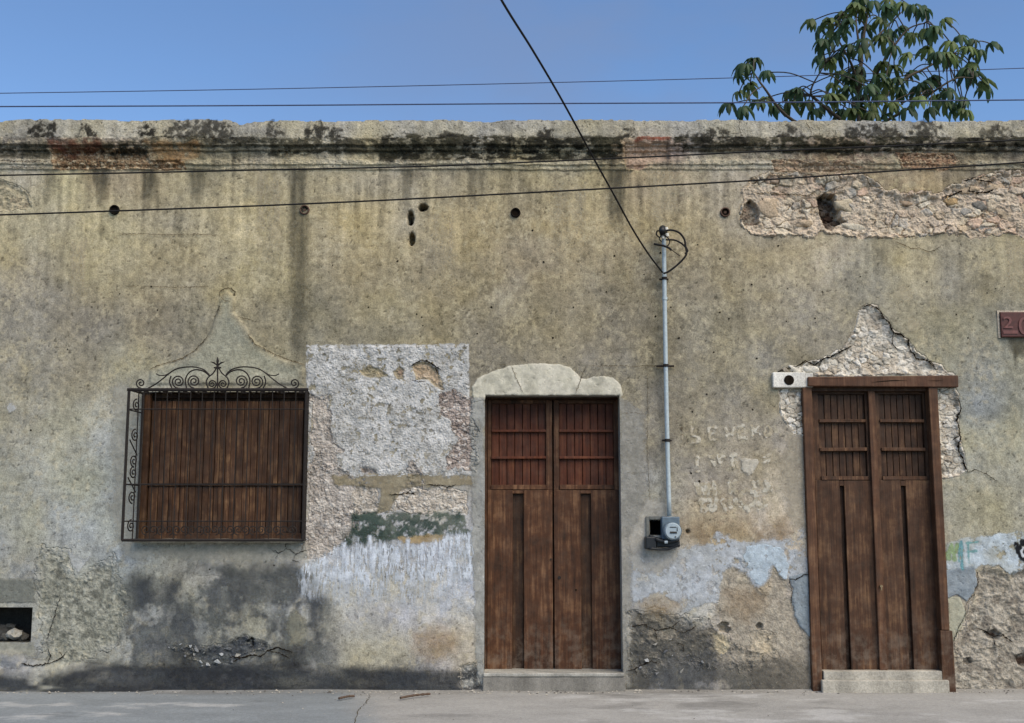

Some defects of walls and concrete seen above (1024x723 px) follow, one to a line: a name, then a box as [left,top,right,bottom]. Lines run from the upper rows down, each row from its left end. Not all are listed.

flaking render [739,159,1024,240]
flaking render [301,395,468,560]
flaking render [358,361,473,471]
flaking render [778,388,803,437]
flaking render [798,303,968,479]
crack [941,398,997,481]
flaking render [171,635,271,668]
leakage [0,577,485,692]
peeling [622,558,811,690]
flaking render [953,566,1024,689]